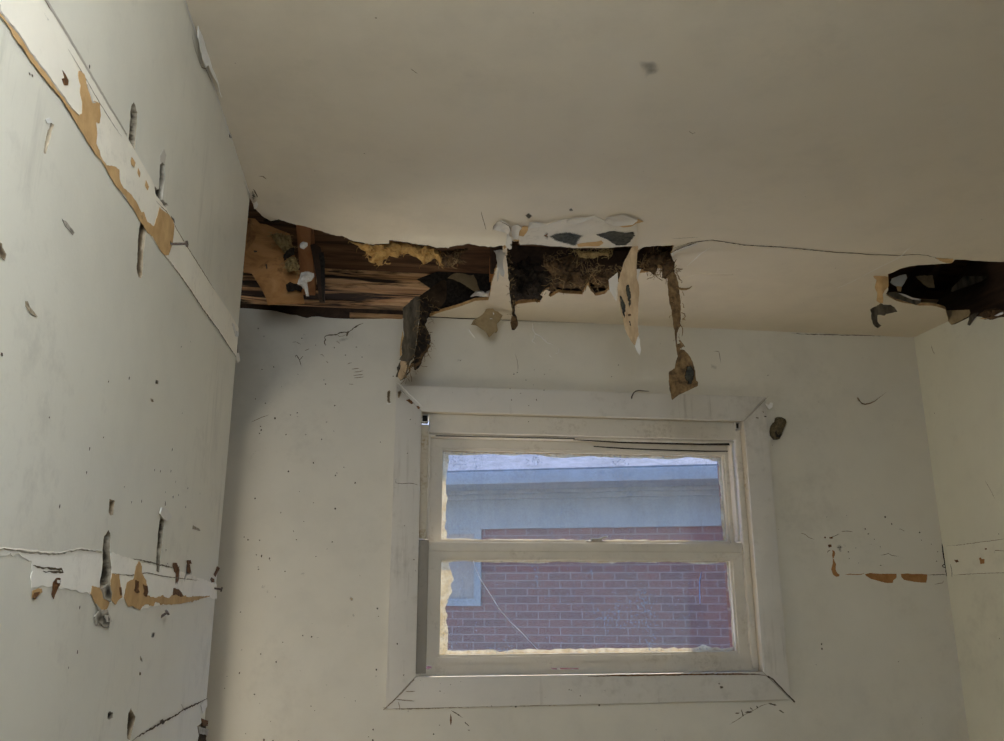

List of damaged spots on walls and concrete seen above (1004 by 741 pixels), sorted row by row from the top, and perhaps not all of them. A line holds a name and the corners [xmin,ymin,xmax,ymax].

peeling [0,5,174,278]
peeling [493,220,522,282]
spalling [886,292,921,305]
spalling [979,308,1004,320]
peeling [387,382,422,409]
peeling [90,530,210,627]
spalling [156,507,172,572]
peeling [824,537,945,583]